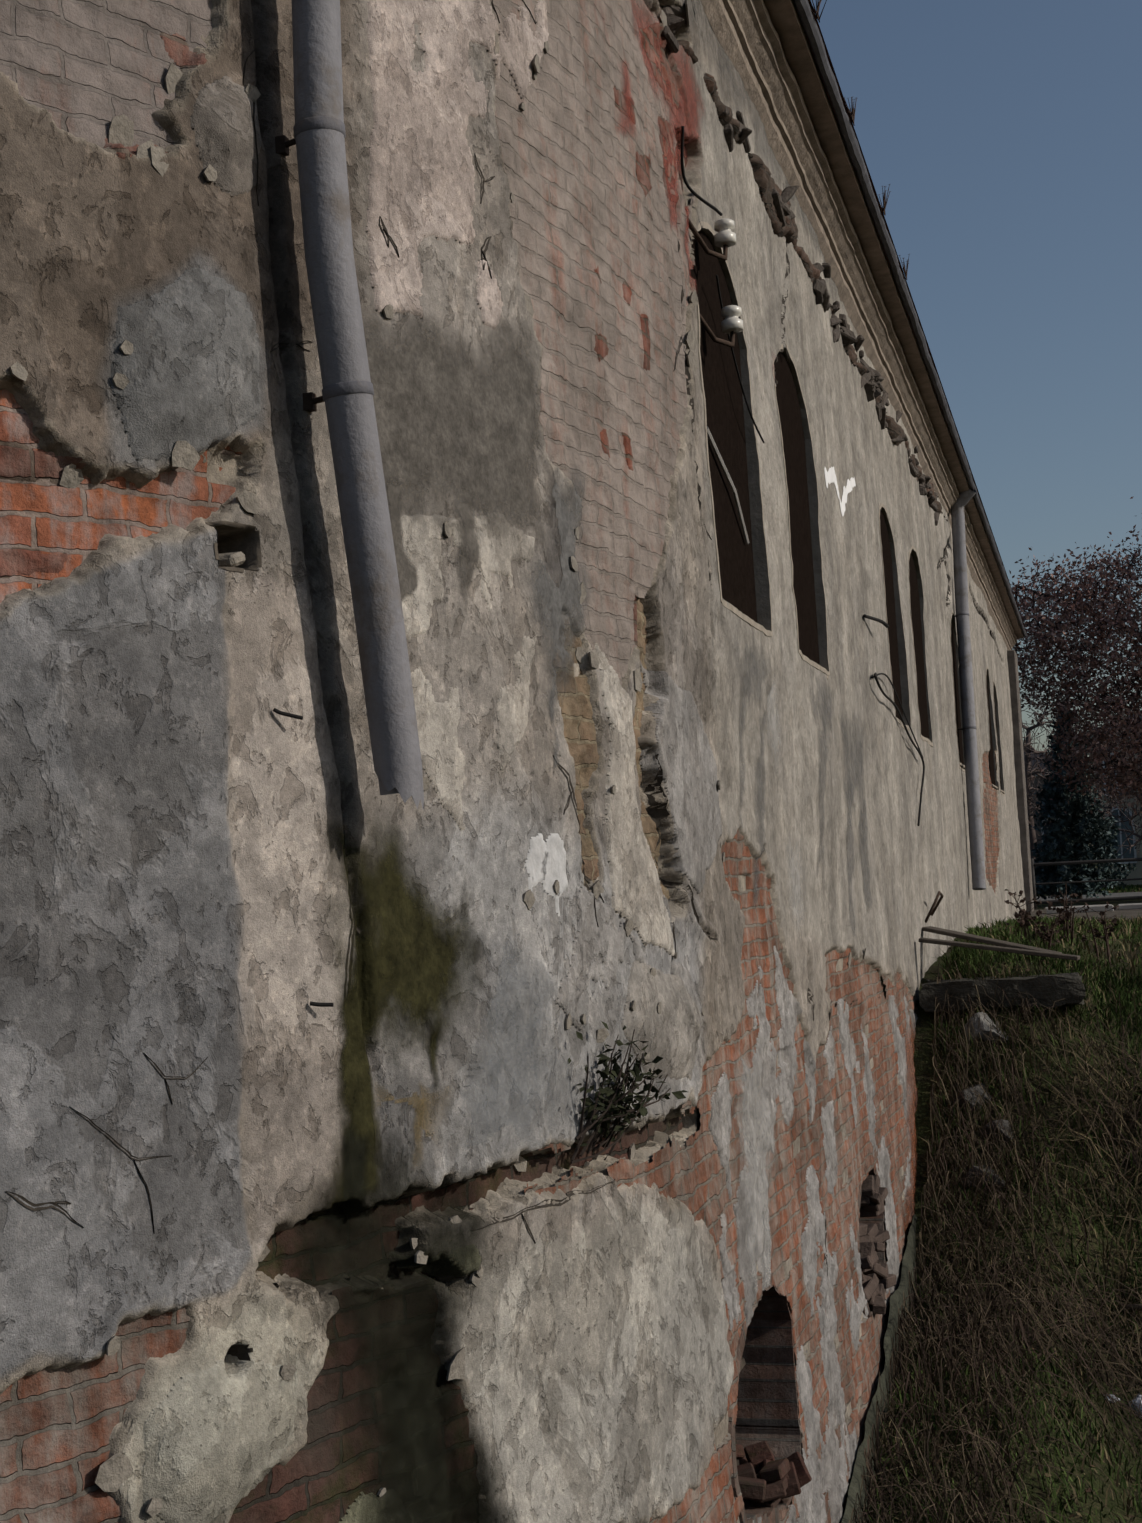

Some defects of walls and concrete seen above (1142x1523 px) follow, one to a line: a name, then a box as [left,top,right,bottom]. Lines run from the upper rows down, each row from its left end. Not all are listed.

spalling [0,0,213,177]
spalling [0,361,262,603]
spalling [365,0,918,1523]
crack [5,1191,84,1228]
crack [69,1106,164,1234]
crack [144,1053,208,1105]
damp [297,827,498,1523]
spalling [0,1306,190,1523]
spalling [224,1342,253,1369]
spalling [229,1213,386,1523]